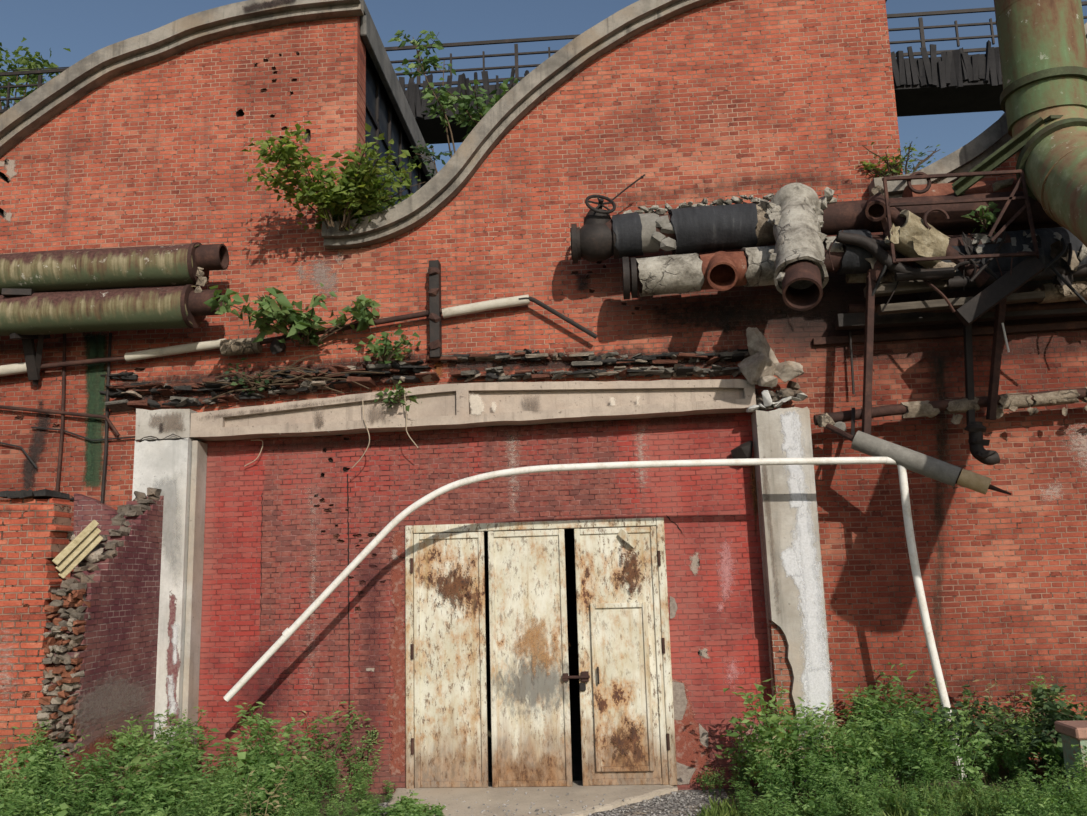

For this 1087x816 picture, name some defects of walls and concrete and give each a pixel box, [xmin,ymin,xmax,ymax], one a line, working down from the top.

leakage [23,454,36,489]
rust [426,558,477,616]
peeling [99,322,831,786]
rust [611,545,650,603]
rust [513,618,557,675]
rust [610,721,644,760]